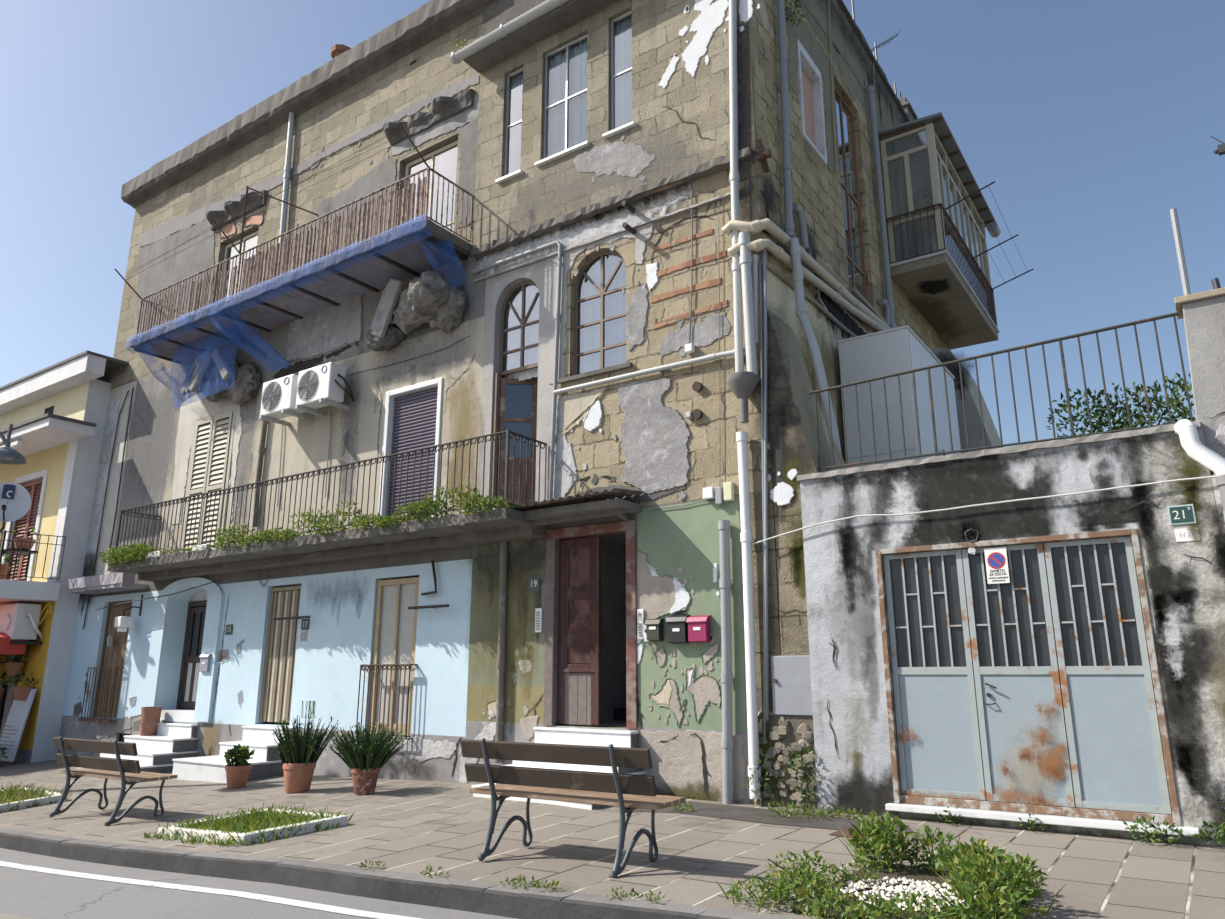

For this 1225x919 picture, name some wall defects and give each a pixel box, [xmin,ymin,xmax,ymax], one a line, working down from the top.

peeling [658,4,690,89]
crack [663,106,713,140]
flaking render [574,135,683,199]
flaking render [548,215,732,505]
peeling [768,469,798,481]
damp [1183,467,1225,578]
spalling [625,542,695,620]
damp [820,435,1210,795]
flaking render [637,634,821,810]
rust [995,760,1054,805]
rust [1019,728,1066,781]